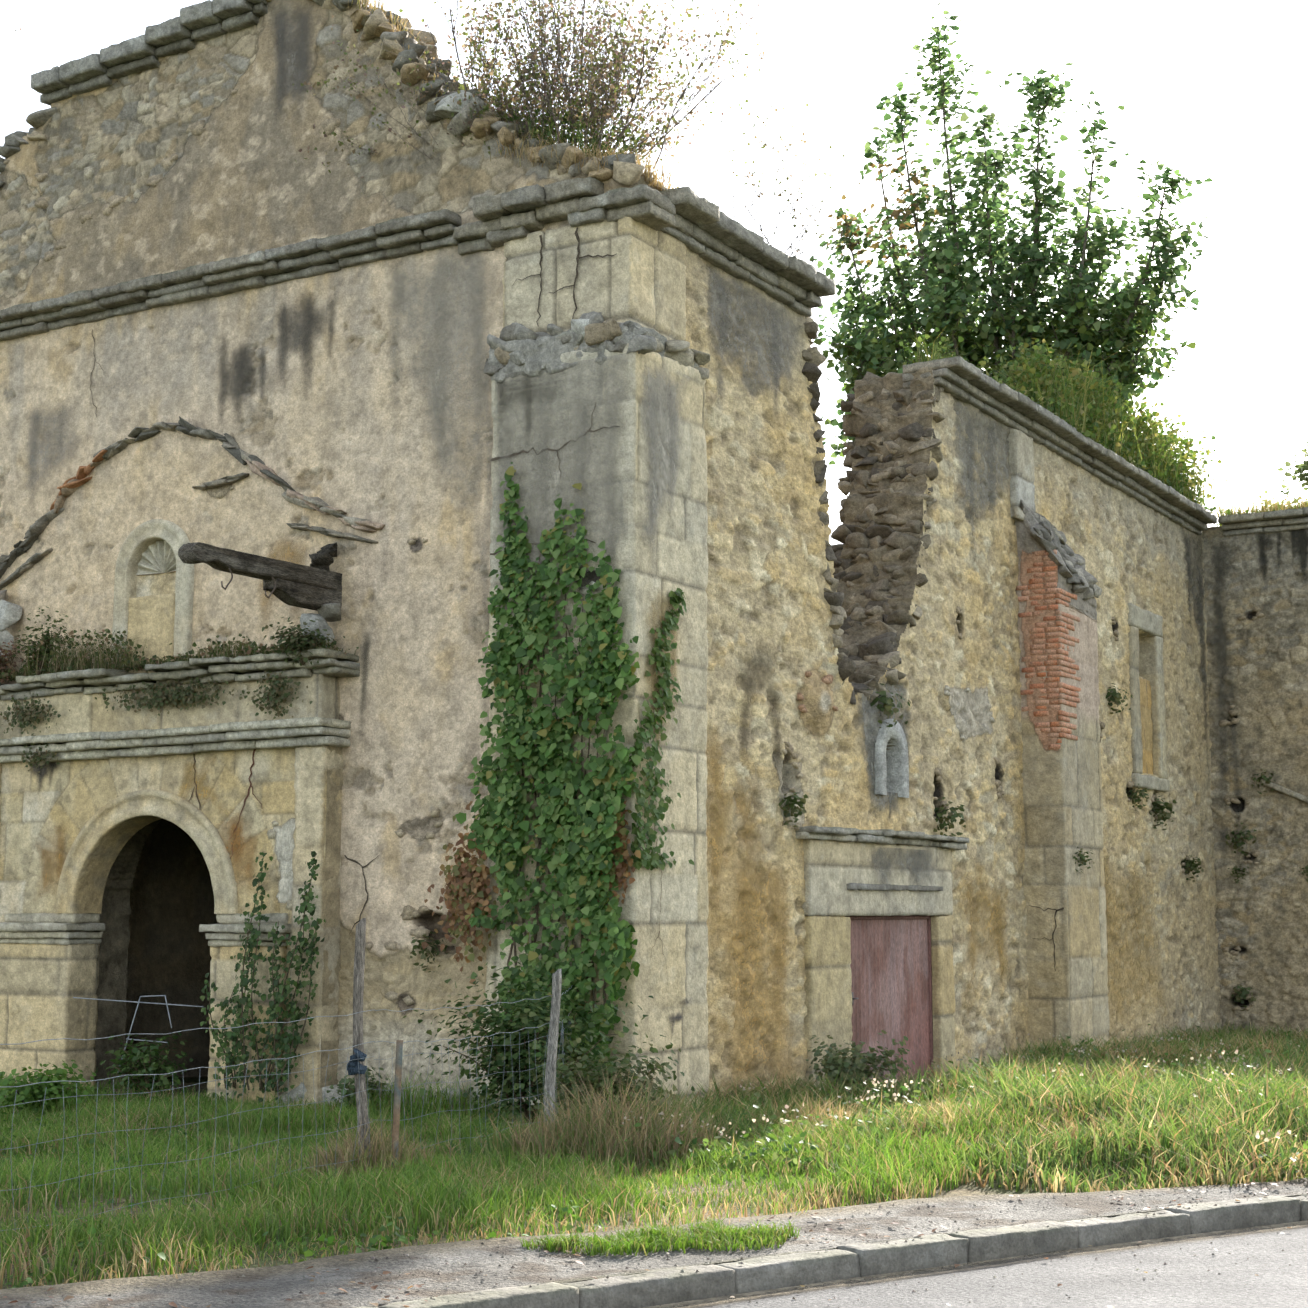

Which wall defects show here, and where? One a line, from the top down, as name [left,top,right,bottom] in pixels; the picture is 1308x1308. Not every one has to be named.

crack [512,227,616,327]
damp [221,350,264,396]
damp [280,308,333,366]
crack [491,403,620,477]
flaking render [1016,549,1081,751]
crack [344,855,379,934]